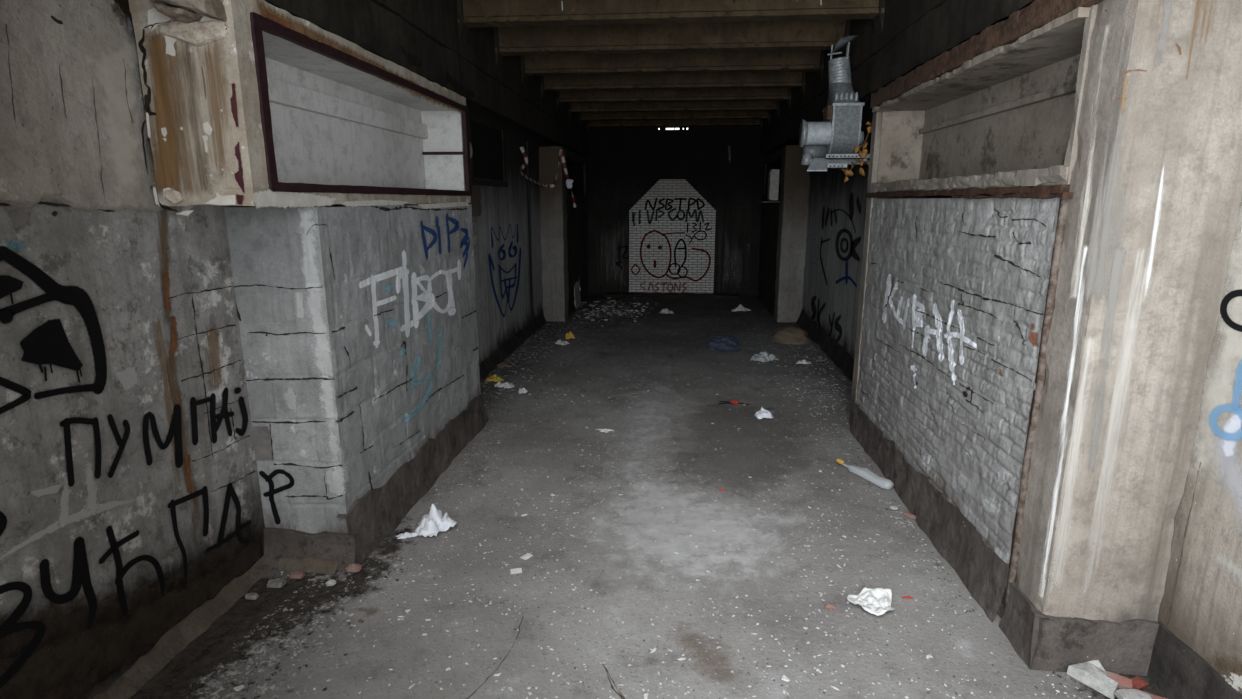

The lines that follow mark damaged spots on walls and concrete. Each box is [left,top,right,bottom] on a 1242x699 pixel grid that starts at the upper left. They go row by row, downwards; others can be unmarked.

crack [5,24,17,128]
crack [0,64,127,216]
crack [123,24,178,212]
corrosion [149,34,226,192]
corrosion [155,210,198,524]
corrosion [207,325,222,386]
peeling [1216,659,1242,691]